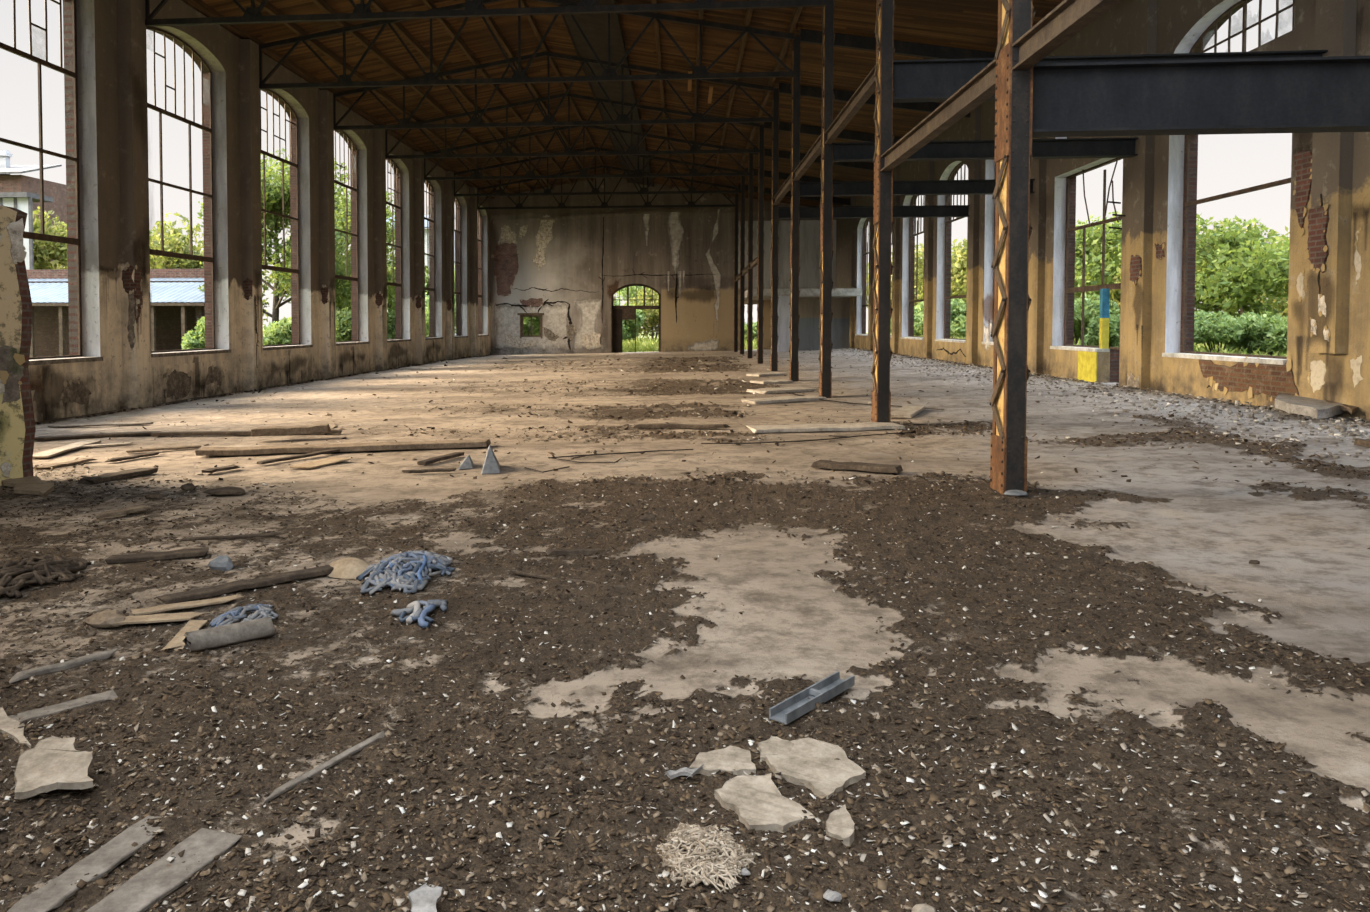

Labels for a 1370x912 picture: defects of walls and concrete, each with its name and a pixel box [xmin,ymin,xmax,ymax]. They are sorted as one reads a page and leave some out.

spalling [491,215,555,307]
spalling [1293,150,1331,342]
peeling [1354,228,1362,285]
peeling [122,262,143,351]
spalling [504,324,601,349]
spalling [1198,356,1326,402]
peeling [1349,354,1364,388]